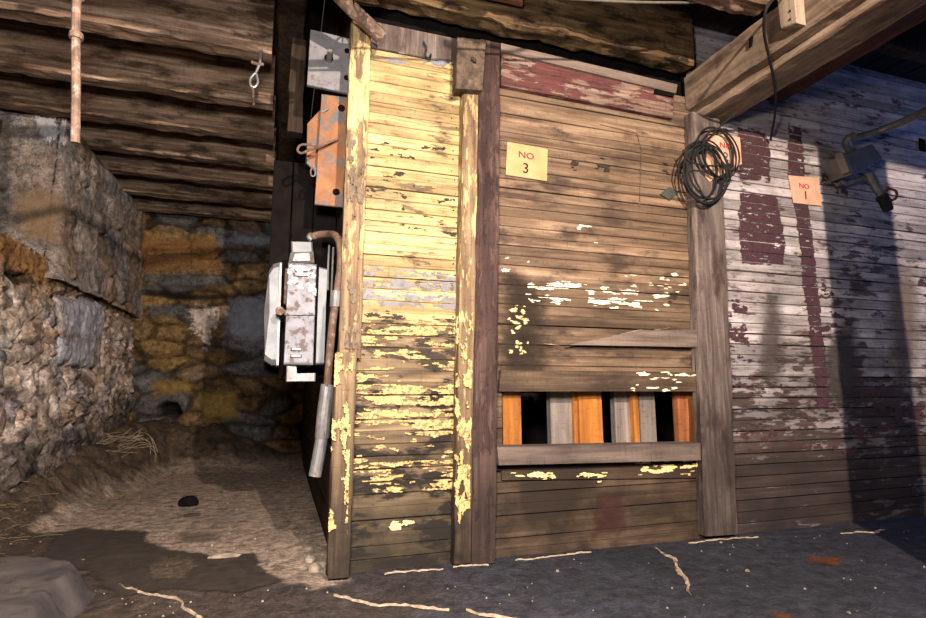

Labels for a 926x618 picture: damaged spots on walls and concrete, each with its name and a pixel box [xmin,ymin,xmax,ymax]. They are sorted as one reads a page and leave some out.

peeling [345,138,415,248]
peeling [507,273,686,354]
peeling [728,299,753,362]
peeling [804,280,854,340]
peeling [328,255,474,532]
peeling [732,375,926,457]
peeling [514,471,555,480]
peeling [637,460,698,476]
crack [655,536,758,595]